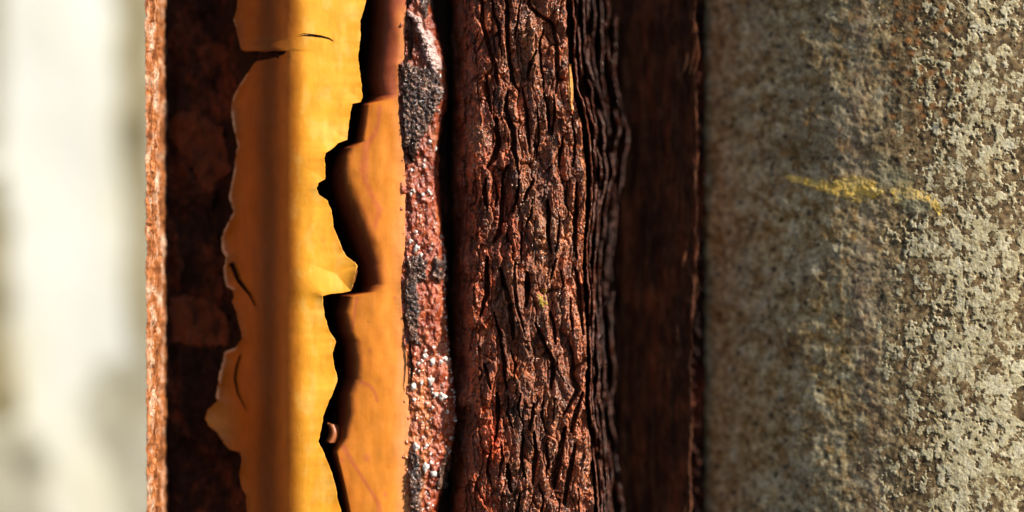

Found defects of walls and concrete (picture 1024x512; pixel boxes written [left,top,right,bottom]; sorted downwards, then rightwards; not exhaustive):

peeling [205,0,629,512]